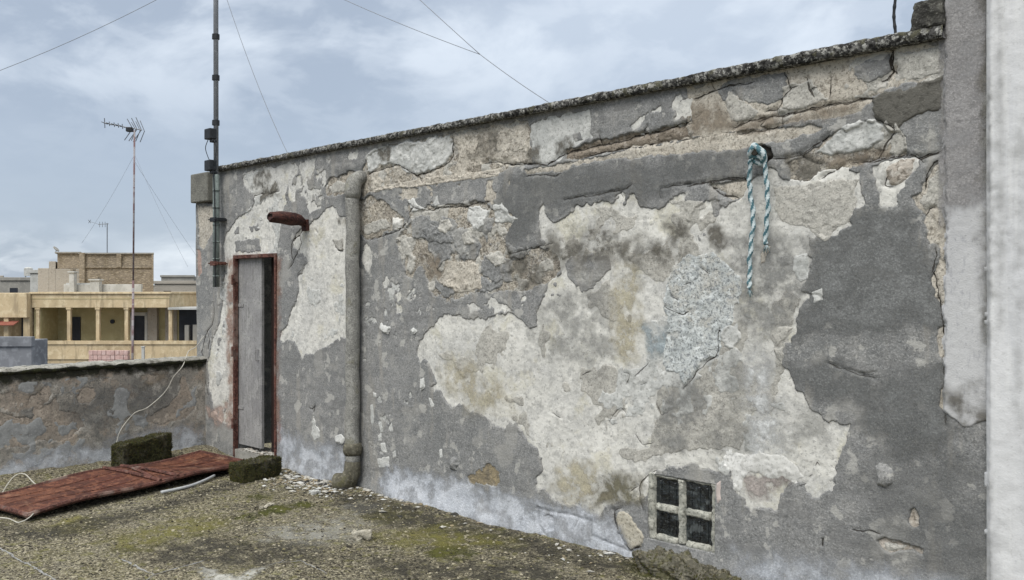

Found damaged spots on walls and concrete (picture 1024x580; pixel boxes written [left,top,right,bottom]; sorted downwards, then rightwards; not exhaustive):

crack [734,51,941,215]
peeling [185,44,947,550]
crack [932,251,945,333]
peeling [0,376,96,436]
damp [329,392,633,580]